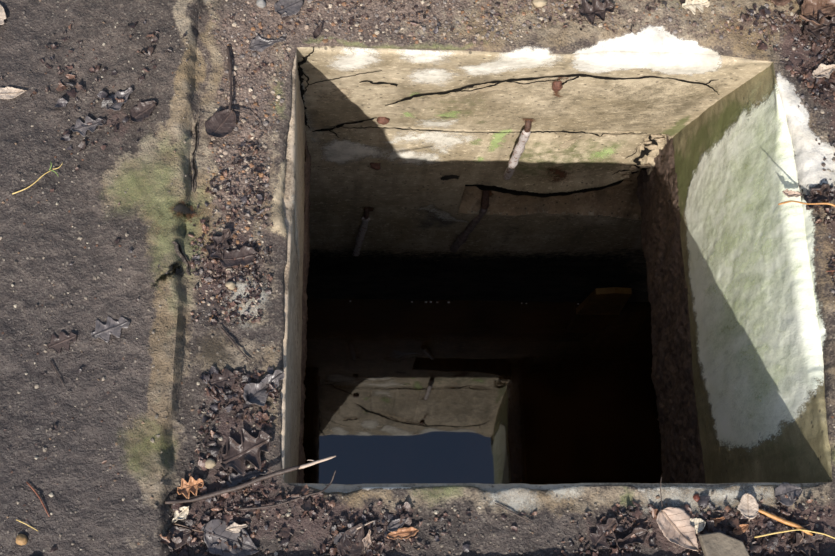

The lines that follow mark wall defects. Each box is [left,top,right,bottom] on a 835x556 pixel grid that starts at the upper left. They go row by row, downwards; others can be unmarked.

crack [298,47,719,198]
spalling [619,134,671,177]